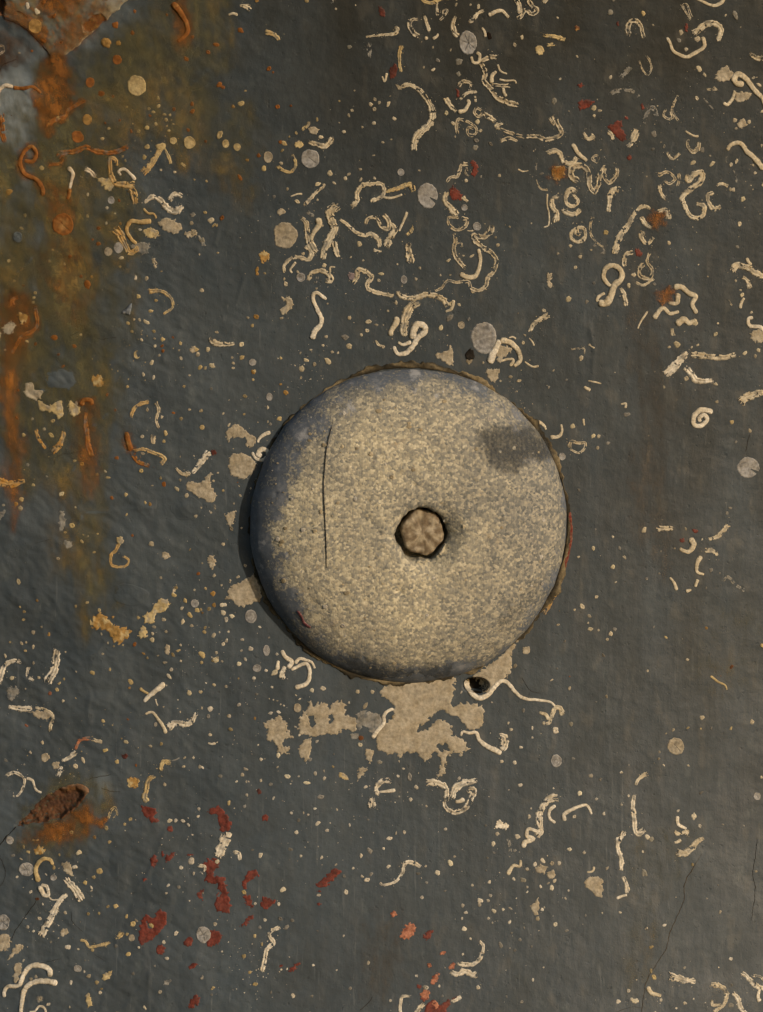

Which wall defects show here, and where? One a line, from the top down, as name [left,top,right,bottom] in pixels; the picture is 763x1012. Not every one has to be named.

peeling [0,0,128,56]
corrosion [0,0,97,346]
corrosion [1,293,30,445]
spalling [463,677,488,693]
spalling [18,784,89,827]